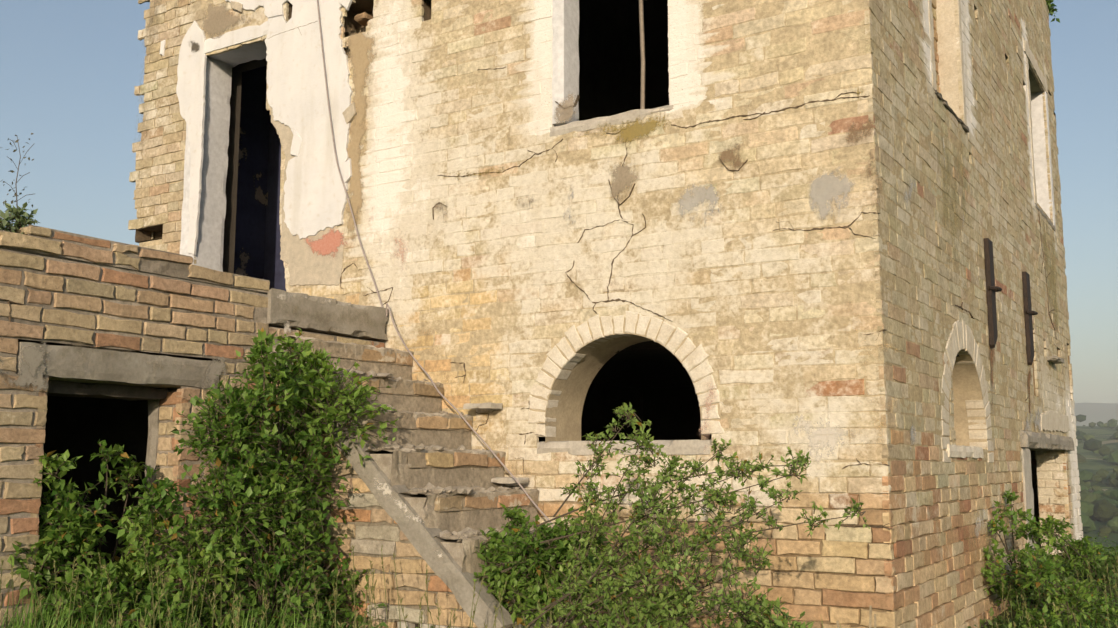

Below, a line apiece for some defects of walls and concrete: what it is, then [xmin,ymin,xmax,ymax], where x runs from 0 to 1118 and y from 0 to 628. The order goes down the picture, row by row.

crack [674,92,870,128]
flaking render [176,0,377,286]
crack [438,138,563,177]
hole [135,225,164,243]
crack [773,212,880,238]
crack [565,194,673,322]